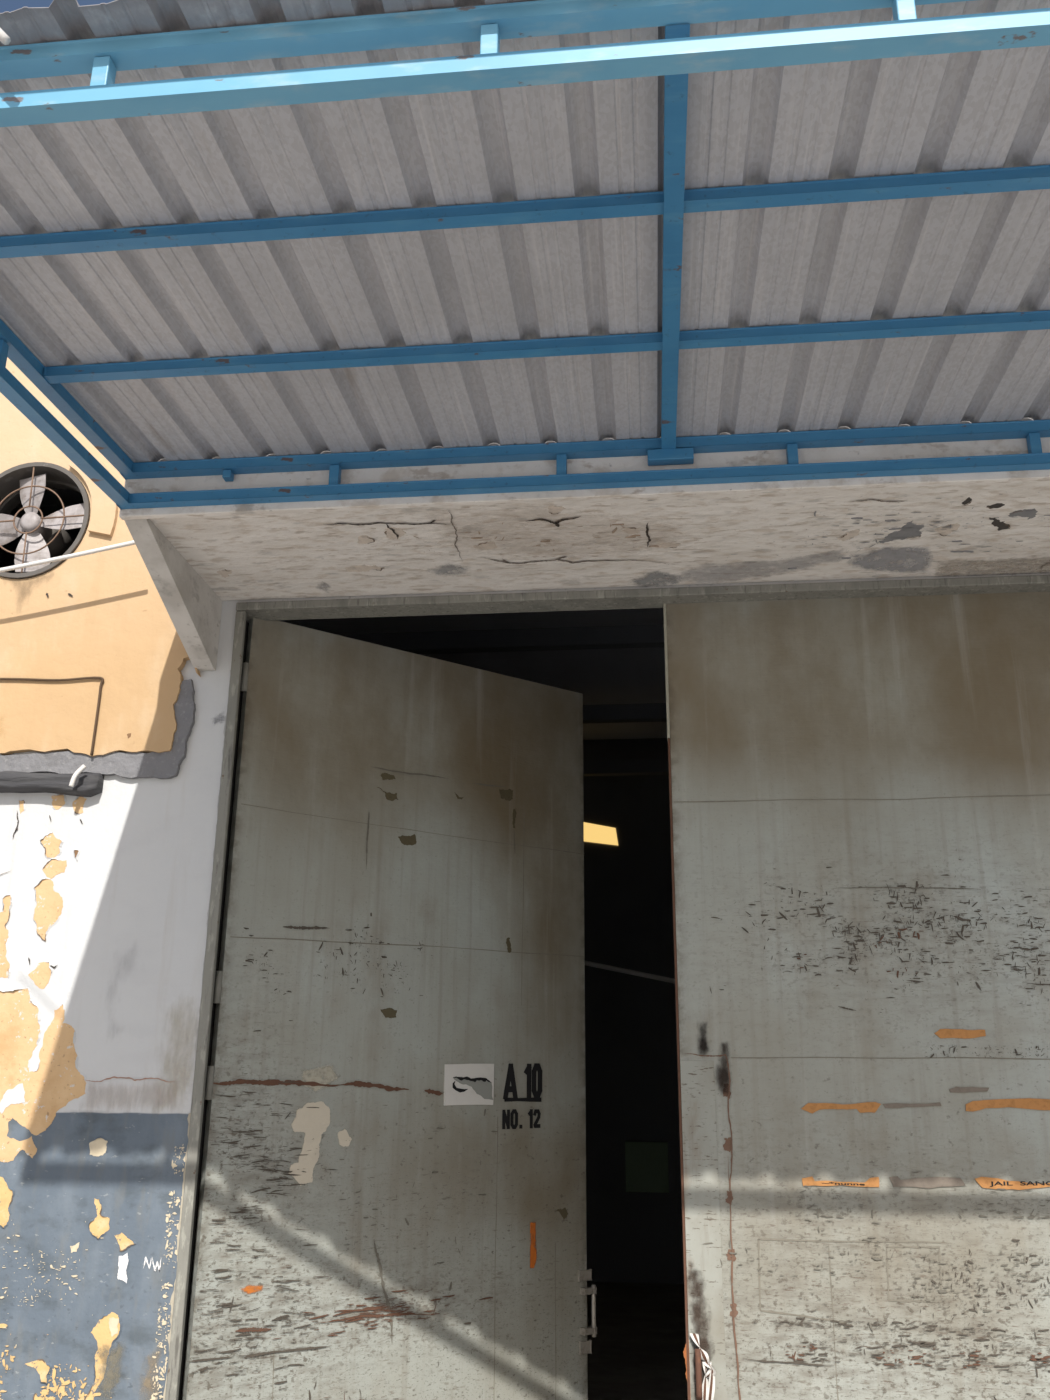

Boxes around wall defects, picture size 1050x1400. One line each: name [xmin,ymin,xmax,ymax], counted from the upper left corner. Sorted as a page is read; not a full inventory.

crack [327,512,669,565]
leakage [634,573,677,586]
leakage [853,548,928,572]
peeling [32,832,81,942]
peeling [0,893,137,1400]
peeling [150,1144,186,1400]